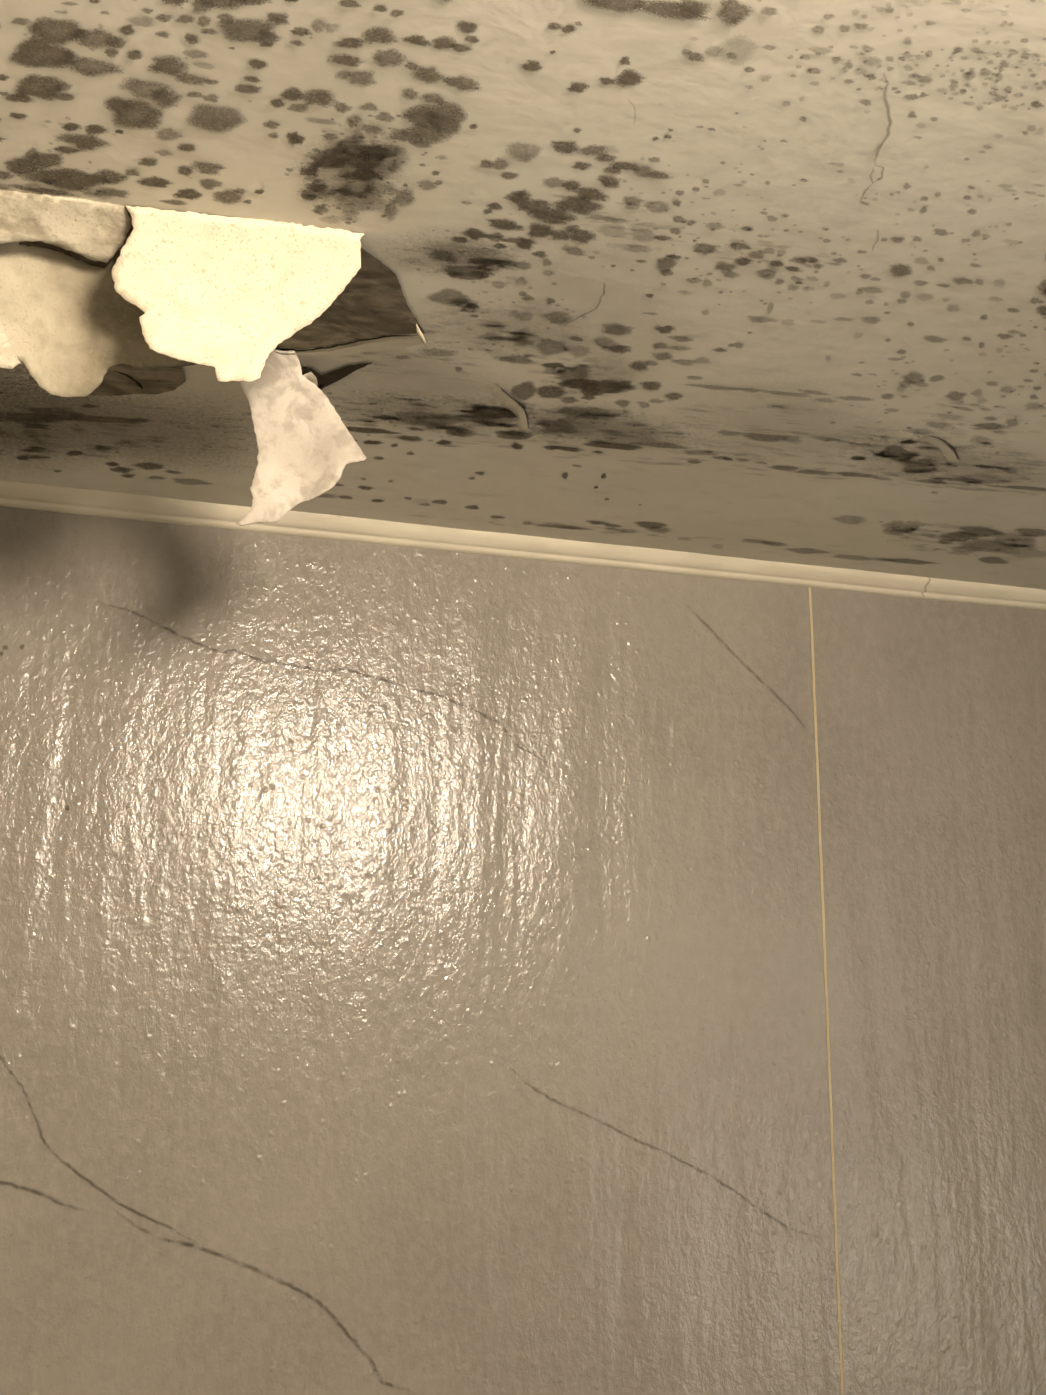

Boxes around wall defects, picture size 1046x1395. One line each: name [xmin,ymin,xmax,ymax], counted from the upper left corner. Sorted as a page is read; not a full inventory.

damp [548,22,582,33]
damp [586,0,776,25]
damp [522,50,555,71]
damp [568,57,644,93]
damp [682,49,704,61]
damp [0,0,480,218]
damp [430,128,780,304]
peeling [0,189,429,526]
damp [509,292,687,407]
damp [0,370,250,479]
damp [347,413,474,460]
damp [496,420,676,453]